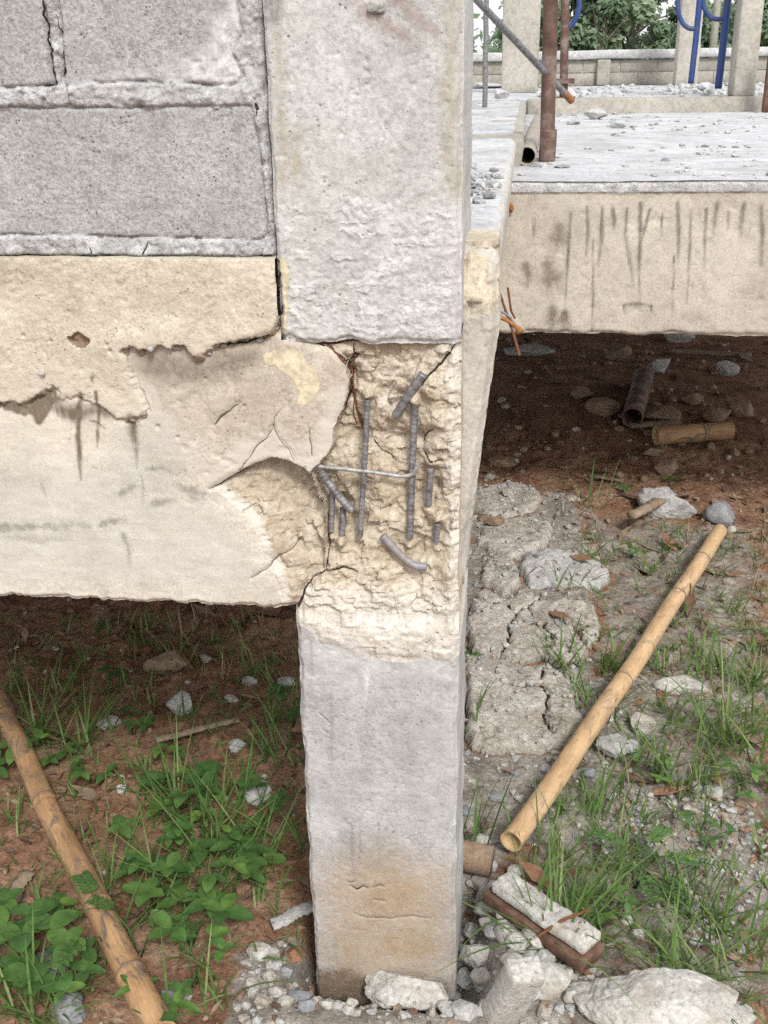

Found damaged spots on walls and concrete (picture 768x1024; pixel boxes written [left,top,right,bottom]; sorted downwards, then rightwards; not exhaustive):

crack [0,242,148,256]
peeling [336,195,377,239]
water stain [587,203,650,262]
spalling [67,332,90,348]
crack [227,254,283,345]
water stain [550,307,568,325]
water stain [0,387,108,467]
crack [214,403,239,425]
crack [212,407,312,488]
spalling [123,260,464,618]
crack [251,493,355,607]